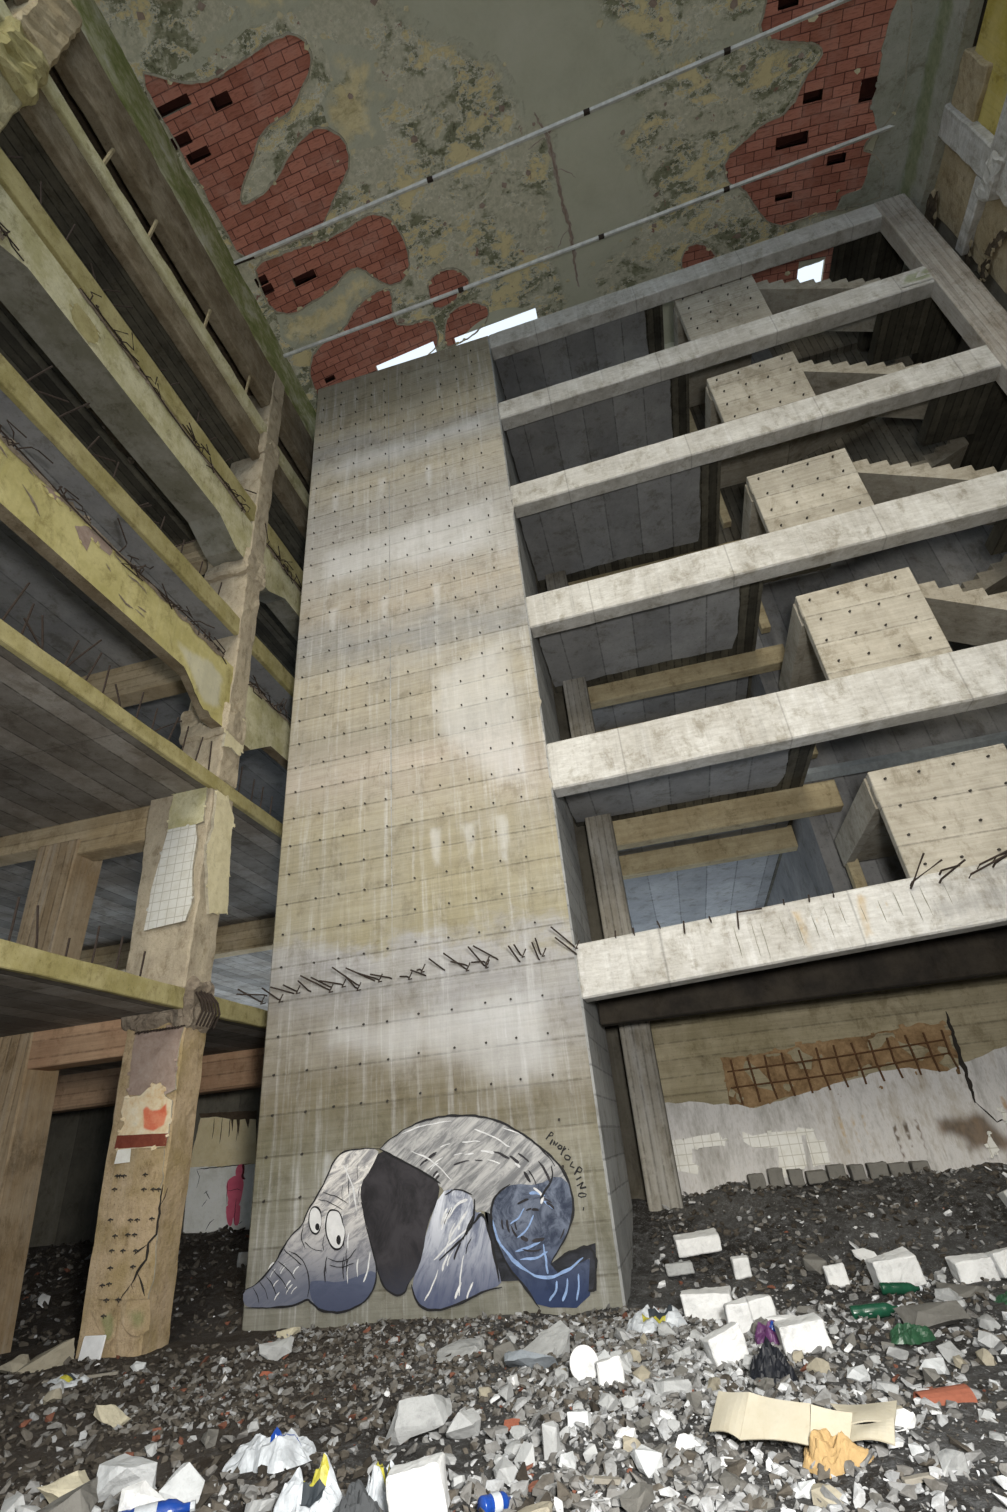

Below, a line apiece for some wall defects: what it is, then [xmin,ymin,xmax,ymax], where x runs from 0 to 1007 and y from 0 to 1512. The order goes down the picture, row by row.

flaking render [94,0,938,412]
spalling [236,926,580,1005]
spalling [720,1020,961,1108]
crack [945,1011,1003,1123]
spalling [97,990,221,1319]
damp [889,1104,1007,1164]
crack [117,1163,250,1305]